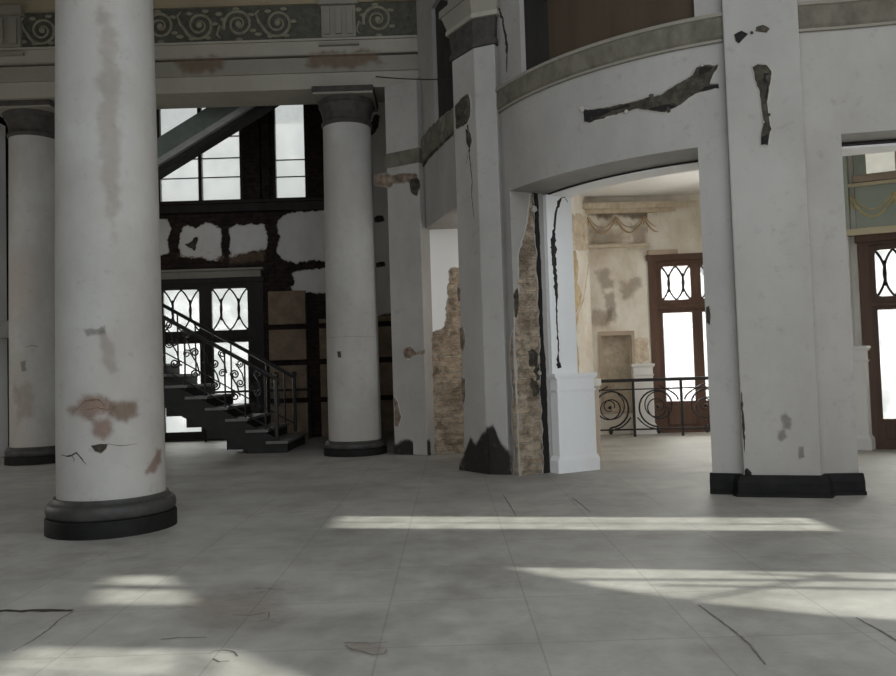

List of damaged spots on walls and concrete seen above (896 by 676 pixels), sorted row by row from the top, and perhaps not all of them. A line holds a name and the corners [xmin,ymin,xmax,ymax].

spalling [734,25,770,44]
spalling [579,63,720,124]
spalling [751,63,773,147]
peeling [159,210,326,294]
flaking render [403,267,466,454]
flaking render [509,194,544,476]